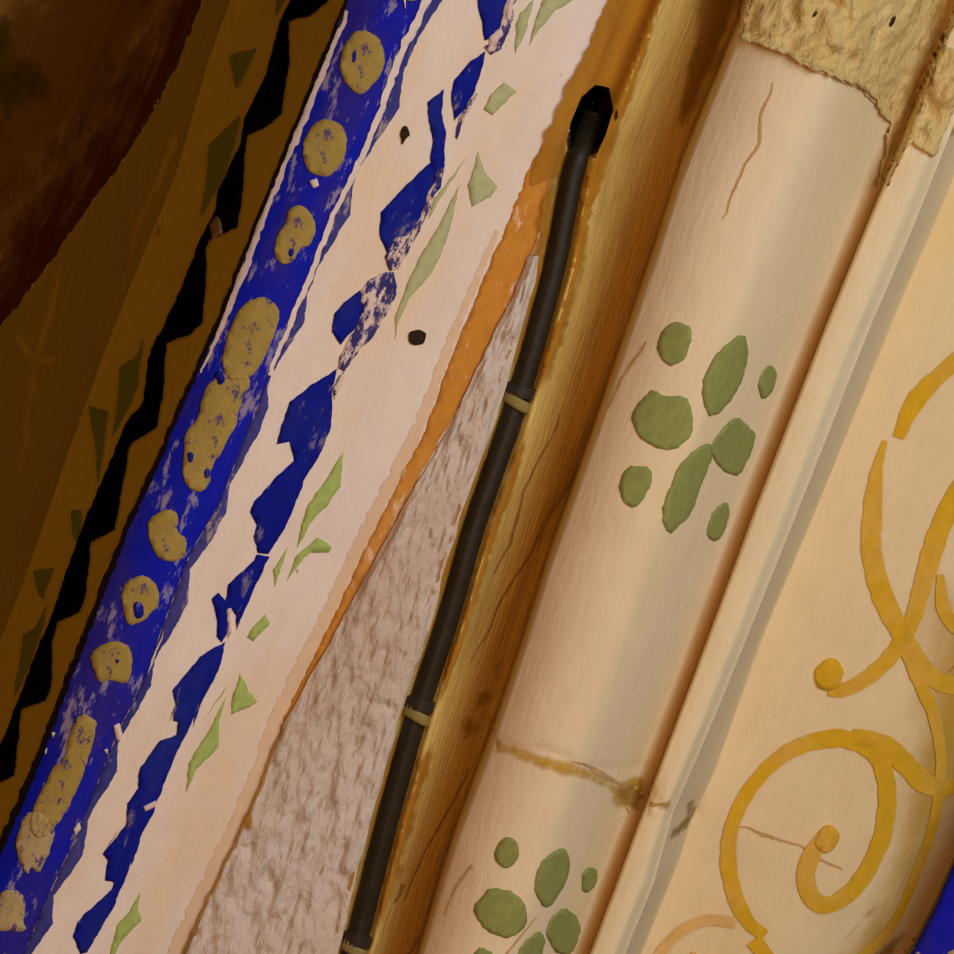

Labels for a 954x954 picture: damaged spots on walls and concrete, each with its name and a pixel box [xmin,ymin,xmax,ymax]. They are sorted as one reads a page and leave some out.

spalling [737,0,954,188]
crack [573,761,665,813]